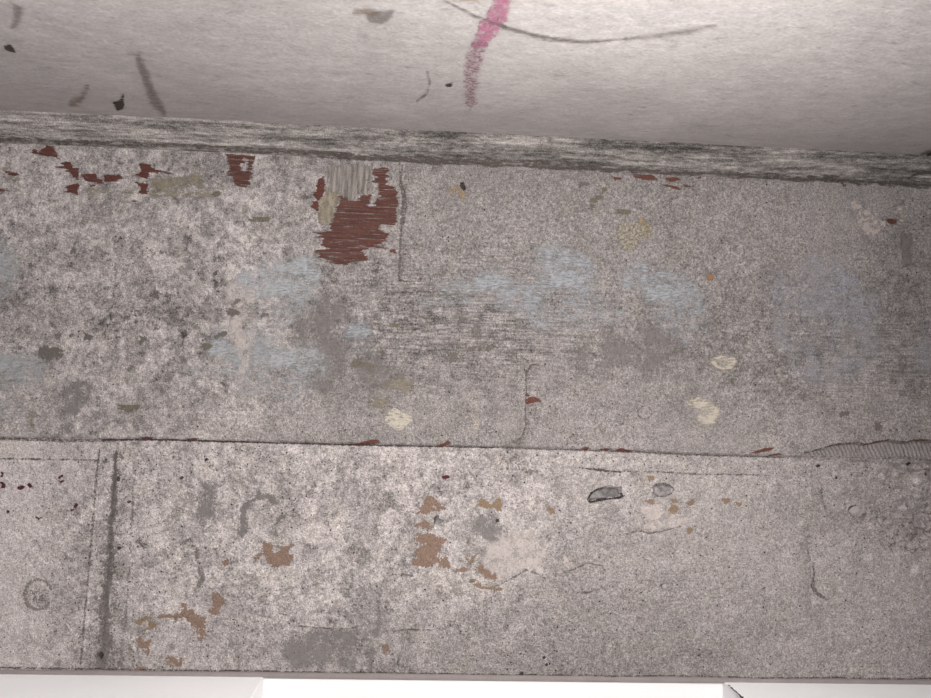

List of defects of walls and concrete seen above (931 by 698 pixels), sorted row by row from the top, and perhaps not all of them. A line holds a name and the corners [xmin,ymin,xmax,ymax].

peeling [31,145,172,202]
peeling [310,162,406,265]
crack [0,364,931,698]